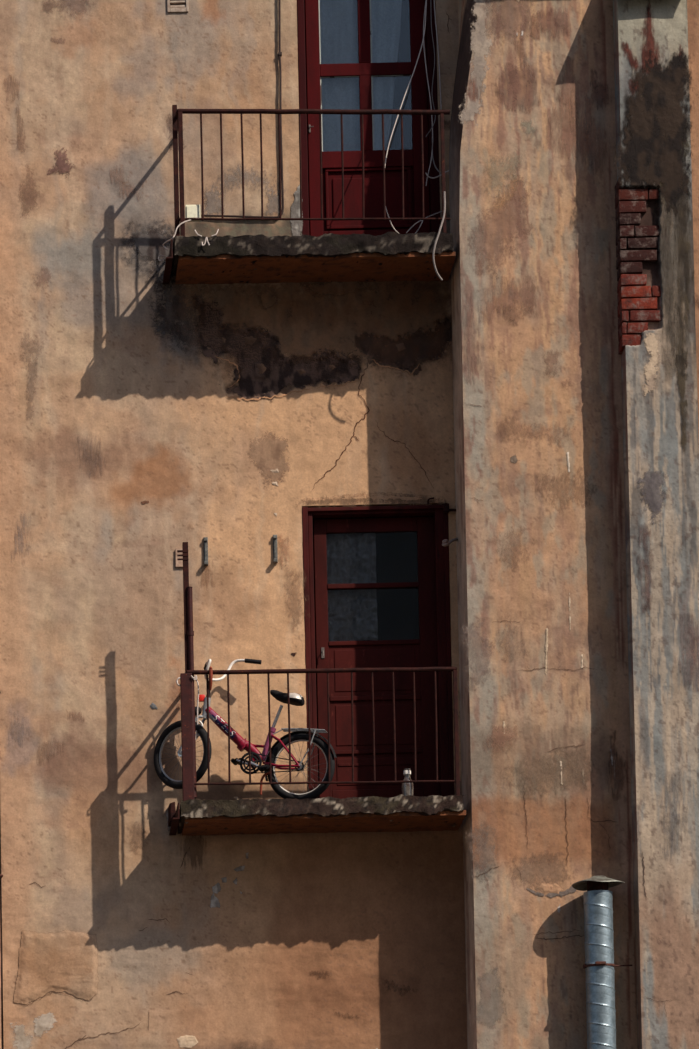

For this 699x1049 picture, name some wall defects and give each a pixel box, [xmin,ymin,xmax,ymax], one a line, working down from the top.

flaking render [290,185,303,236]
peeling [468,180,537,323]
flaking render [615,178,662,355]
flaking render [175,297,452,402]
crack [311,345,434,491]
water stain [510,748,594,799]